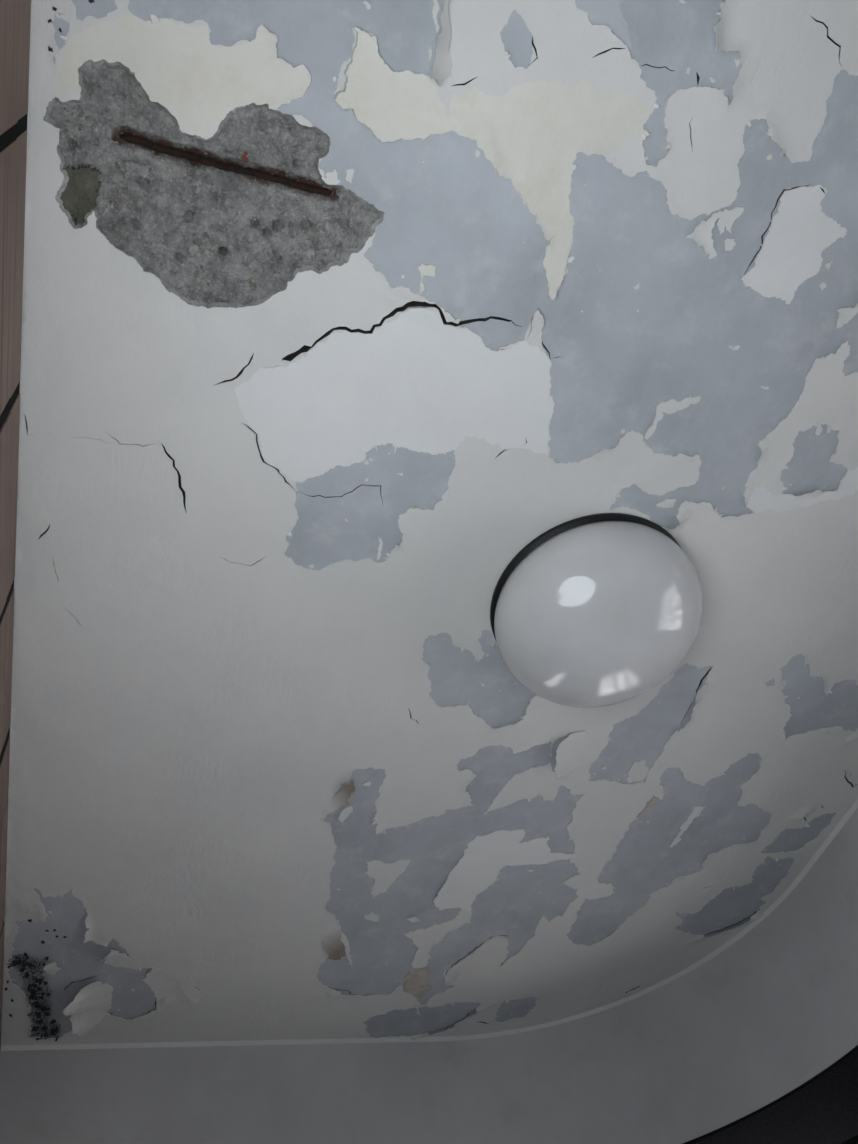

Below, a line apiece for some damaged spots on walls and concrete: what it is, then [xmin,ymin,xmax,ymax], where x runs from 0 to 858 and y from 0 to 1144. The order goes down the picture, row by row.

peeling [43,0,858,529]
crack [215,353,254,385]
crack [282,301,562,361]
crack [116,439,187,513]
peeling [284,443,456,570]
peeling [422,630,536,728]
peeling [764,654,858,738]
peeling [316,663,836,1039]
damp [4,929,67,1041]
peeling [8,888,157,1038]